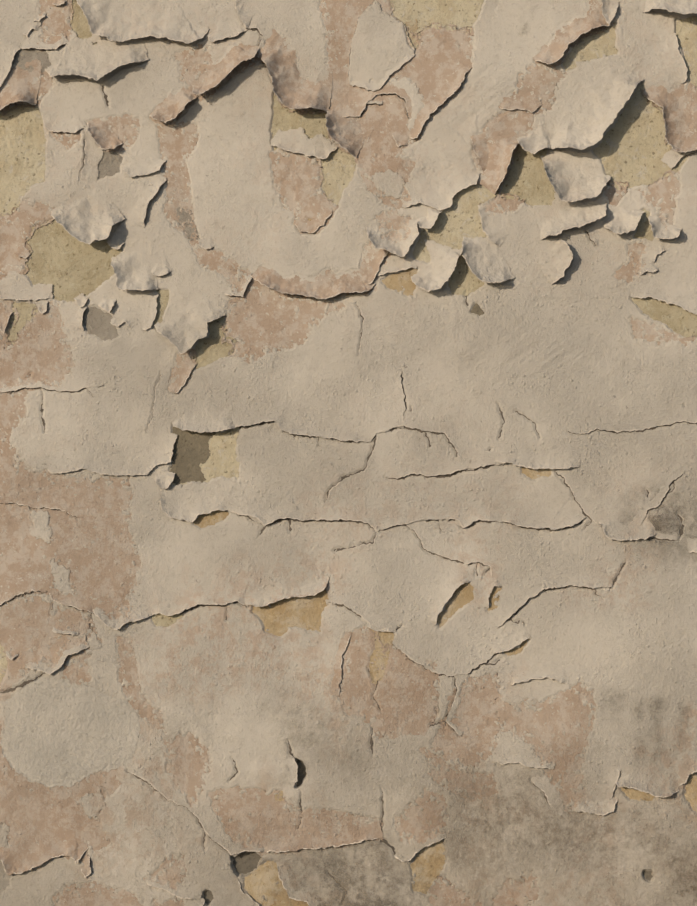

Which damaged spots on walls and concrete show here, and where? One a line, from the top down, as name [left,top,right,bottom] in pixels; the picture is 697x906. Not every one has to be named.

peeling [0,0,697,394]
crack [0,373,105,397]
crack [0,571,260,630]
crack [127,759,240,857]
peeling [0,387,482,906]
crack [160,371,697,736]
peeling [245,564,697,816]
peeling [494,440,580,479]